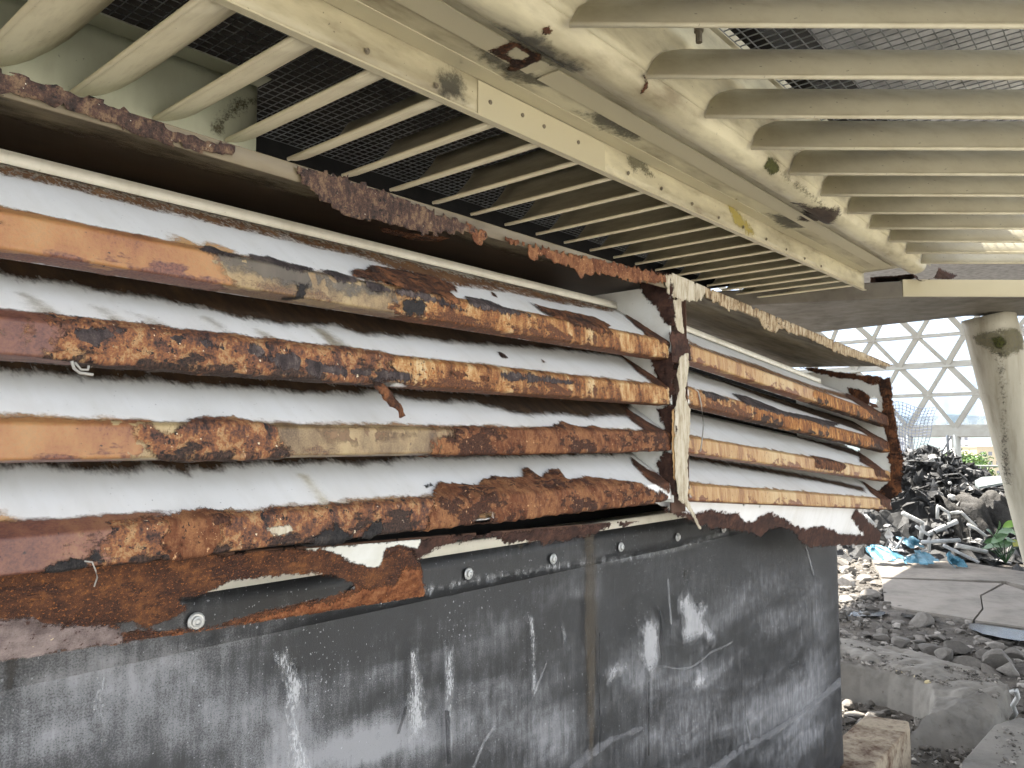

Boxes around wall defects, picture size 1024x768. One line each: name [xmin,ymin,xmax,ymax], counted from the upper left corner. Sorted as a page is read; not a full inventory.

rust [480,27,584,86]
mould [211,97,260,134]
damp [439,74,464,100]
peeling [664,273,706,334]
rust [0,68,904,646]
peeling [674,353,701,529]
efflorescence [640,621,657,671]
efflorescence [680,594,712,641]
efflorescence [406,654,423,734]